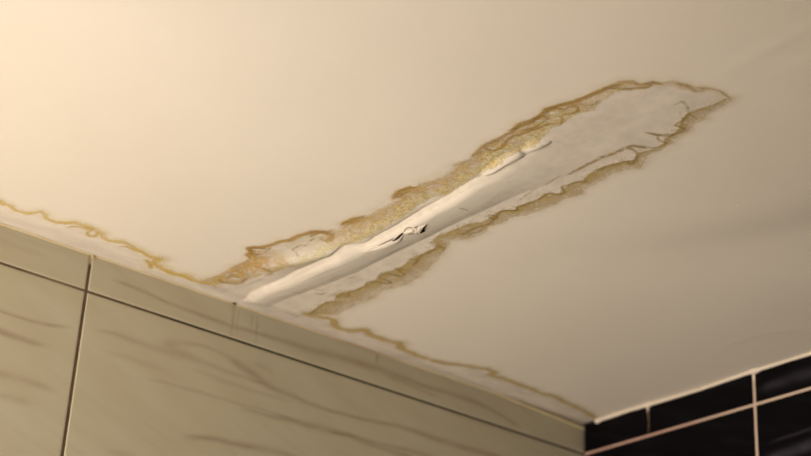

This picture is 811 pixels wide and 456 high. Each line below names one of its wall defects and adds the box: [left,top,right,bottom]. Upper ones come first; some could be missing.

damp [0,81,662,285]
crack [362,224,427,254]
damp [302,99,726,418]